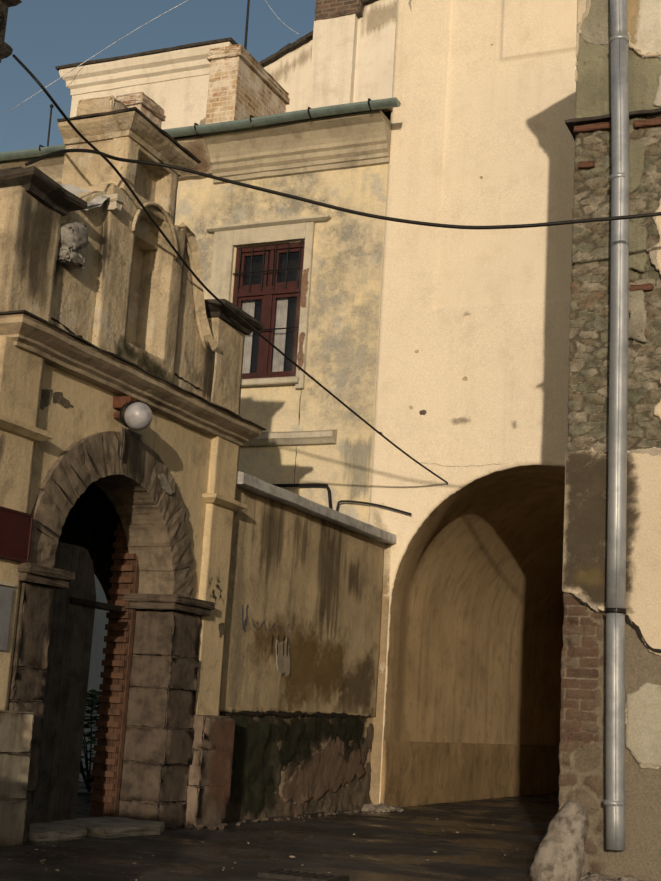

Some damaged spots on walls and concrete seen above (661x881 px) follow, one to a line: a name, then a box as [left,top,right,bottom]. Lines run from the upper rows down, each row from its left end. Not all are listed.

damp [20,196,60,300]
damp [99,200,108,274]
flaking render [566,0,612,454]
flaking render [627,0,661,455]
flaking render [40,389,73,410]
damp [202,341,217,401]
damp [345,441,371,499]
damp [255,519,389,805]
damp [208,720,235,803]
flaking render [559,591,661,881]